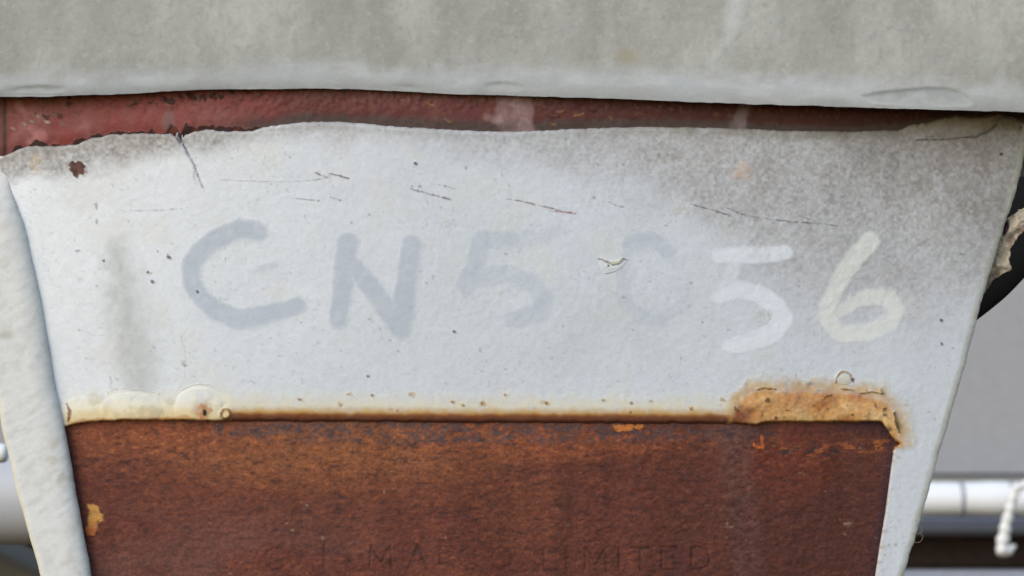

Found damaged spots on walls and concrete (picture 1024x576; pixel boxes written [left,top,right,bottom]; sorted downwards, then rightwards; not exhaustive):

crack [175,132,205,192]
rust [57,368,921,453]
rust [83,502,107,537]